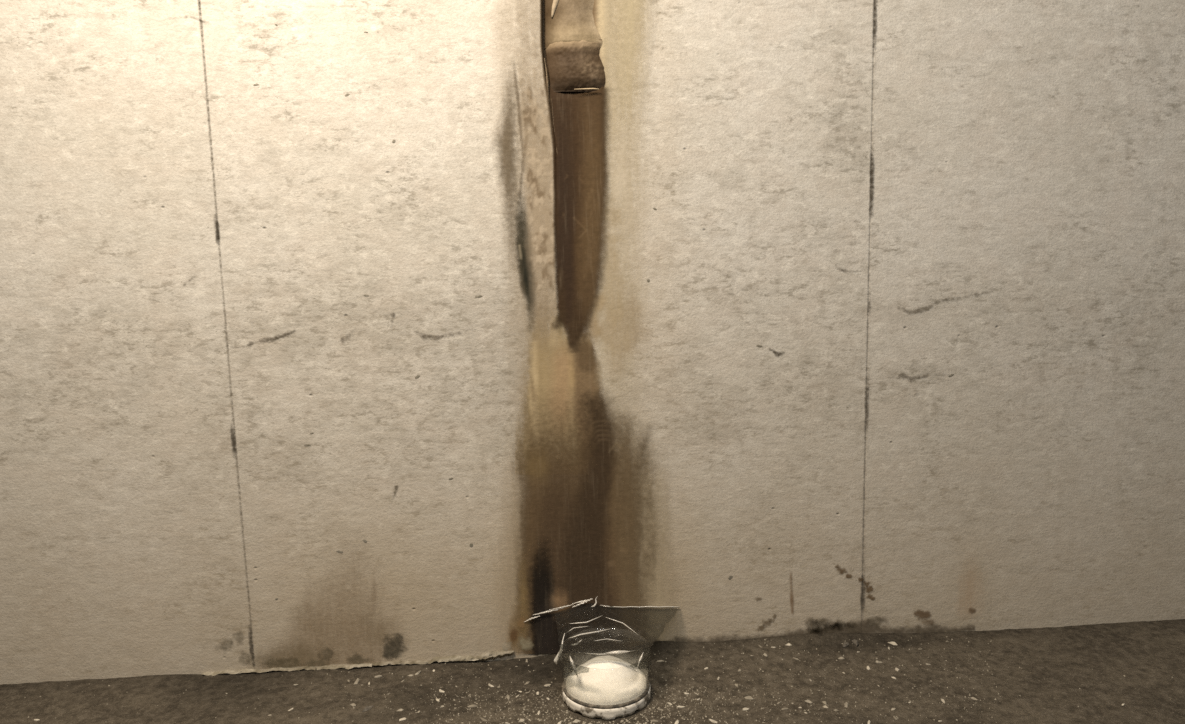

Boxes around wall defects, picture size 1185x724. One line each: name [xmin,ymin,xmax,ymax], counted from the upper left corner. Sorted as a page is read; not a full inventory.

leakage [499,0,975,655]
leakage [267,644,363,668]
leakage [384,634,403,658]